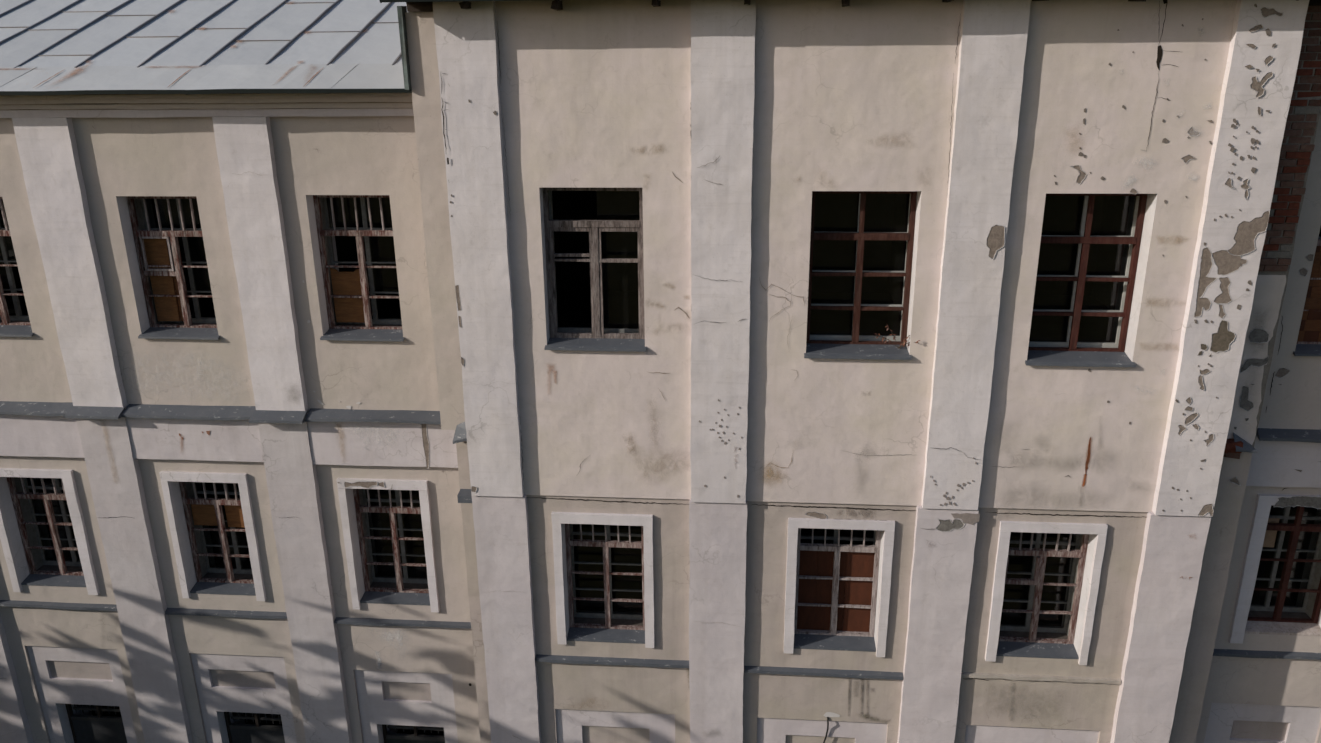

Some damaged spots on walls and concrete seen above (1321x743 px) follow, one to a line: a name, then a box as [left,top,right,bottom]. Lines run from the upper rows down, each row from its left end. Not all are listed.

crack [1143,0,1180,151]
peeling [1162,115,1213,144]
flaking render [987,225,1005,259]
flaking render [1175,0,1321,470]
crack [701,282,805,381]
rust [1082,437,1091,486]
flaking render [921,476,980,532]
flaking render [1172,487,1214,517]